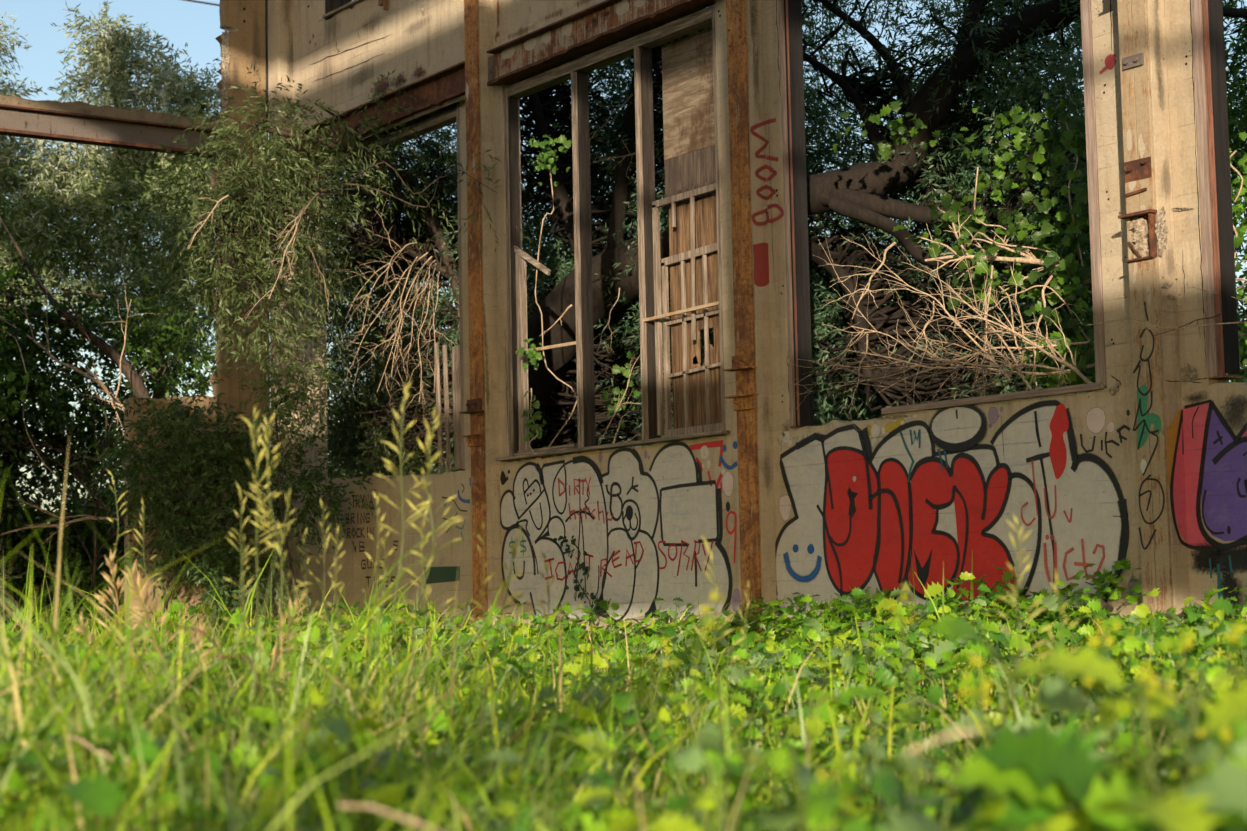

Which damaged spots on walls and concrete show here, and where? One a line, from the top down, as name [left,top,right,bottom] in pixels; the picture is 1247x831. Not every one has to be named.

rust [371,66,424,97]
peeling [1127,129,1145,158]
spalling [1140,205,1194,257]
peeling [1133,261,1176,306]